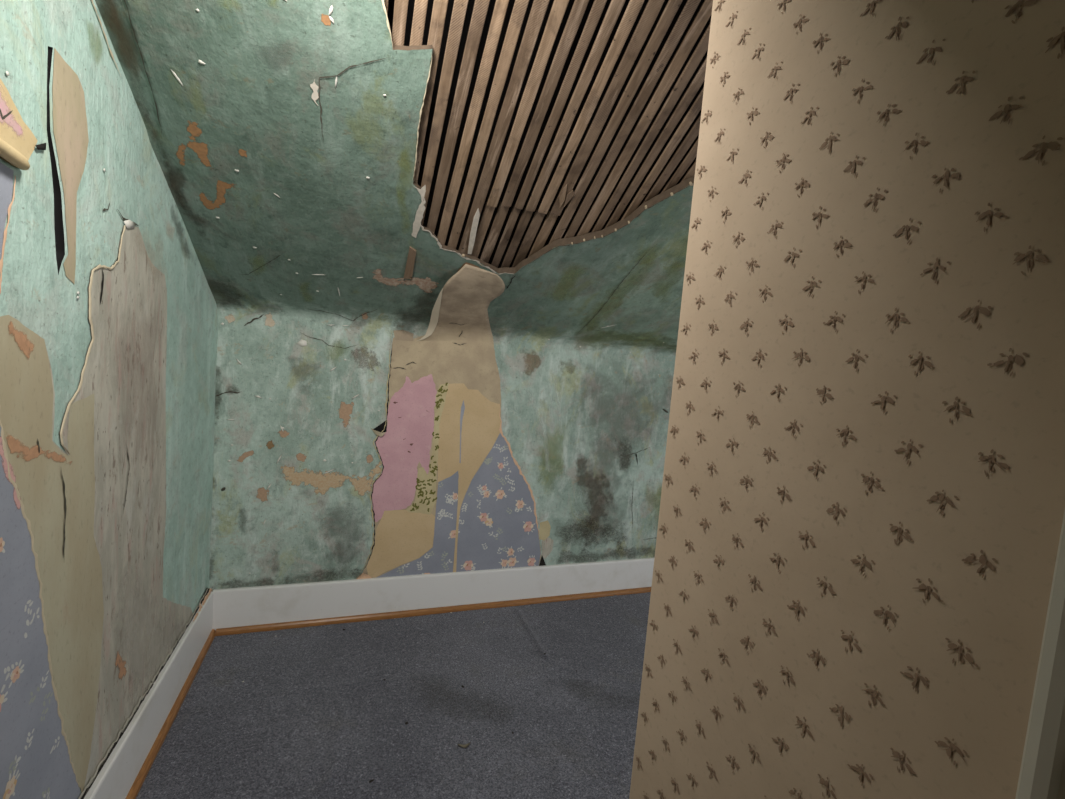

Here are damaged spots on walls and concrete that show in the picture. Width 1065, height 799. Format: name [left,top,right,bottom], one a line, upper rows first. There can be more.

peeling [176,121,211,167]
spalling [412,54,694,275]
peeling [199,169,239,219]
peeling [372,269,439,293]
spalling [371,410,387,437]
peeling [281,453,383,496]
flaking render [0,225,193,796]